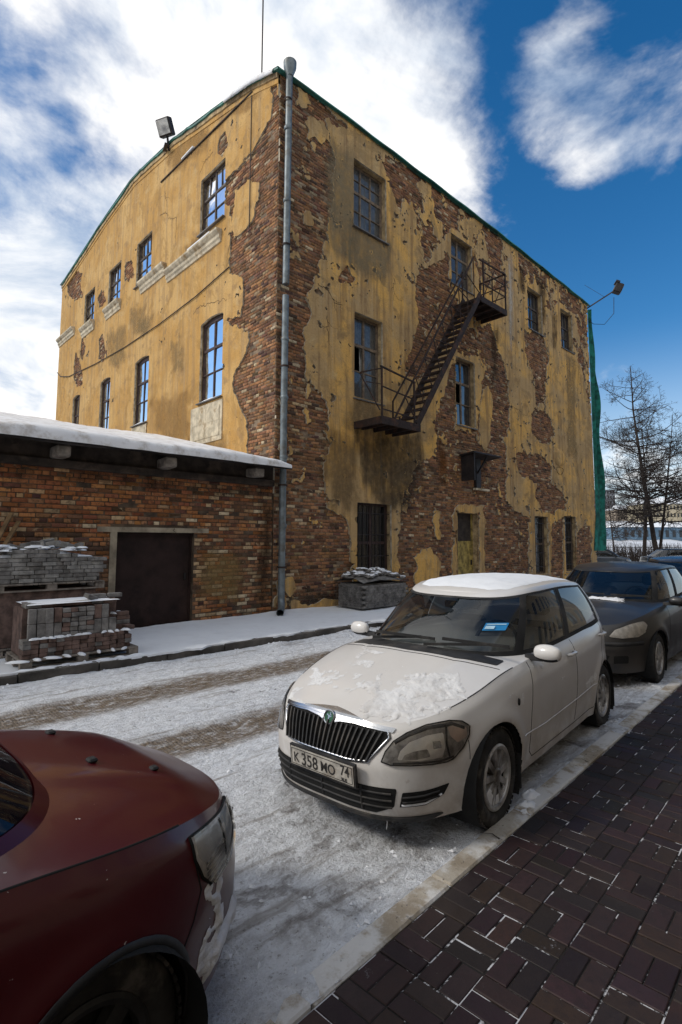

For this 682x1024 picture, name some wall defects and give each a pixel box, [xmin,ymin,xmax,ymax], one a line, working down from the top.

flaking render [218,123,233,157]
flaking render [68,271,83,300]
flaking render [125,260,138,282]
flaking render [378,155,589,404]
flaking render [74,341,86,387]
flaking render [226,75,356,611]
flaking render [390,324,592,590]